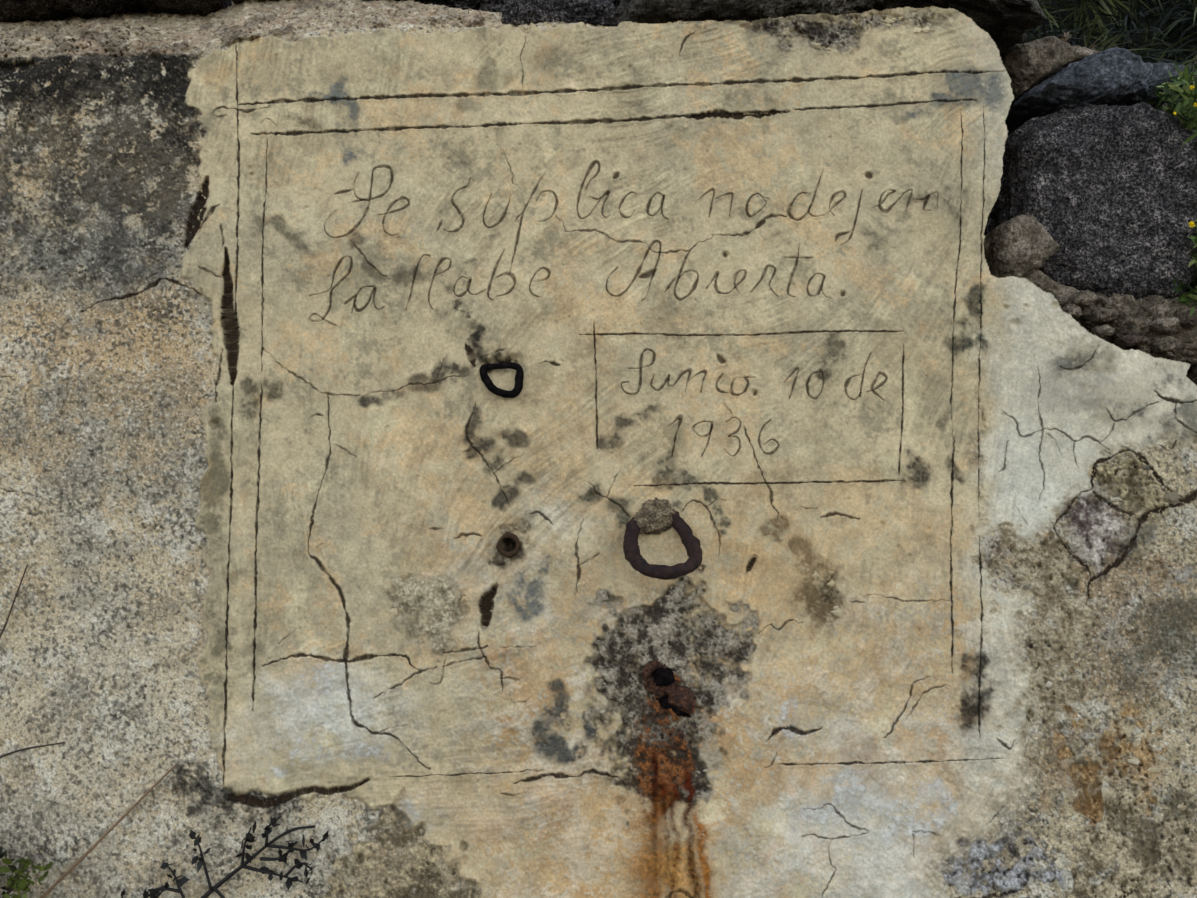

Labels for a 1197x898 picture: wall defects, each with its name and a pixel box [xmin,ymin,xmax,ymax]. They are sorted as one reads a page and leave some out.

crack [83,180,524,769]
crack [465,404,600,588]
crack [588,482,628,515]
crack [1003,345,1197,605]
crack [229,778,370,808]
spalling [582,566,759,806]
rust [635,695,711,898]
spalling [944,450,1197,898]